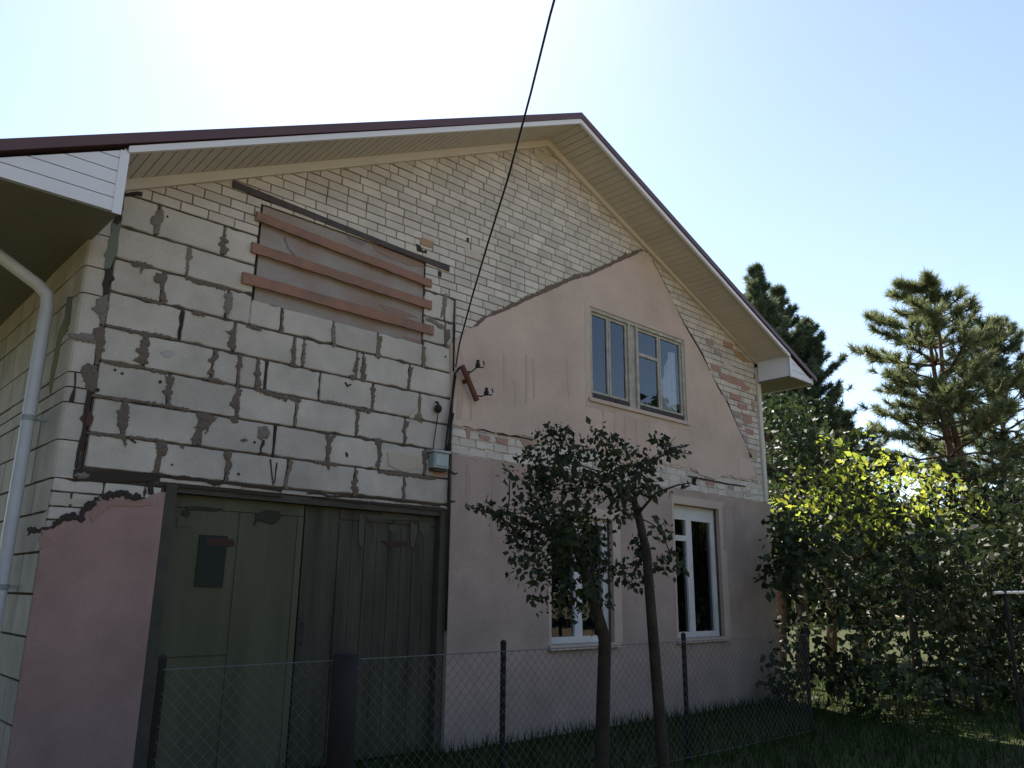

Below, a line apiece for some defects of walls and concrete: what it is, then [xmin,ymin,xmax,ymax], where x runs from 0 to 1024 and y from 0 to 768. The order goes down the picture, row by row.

peeling [706,338,755,442]
spalling [27,490,144,536]